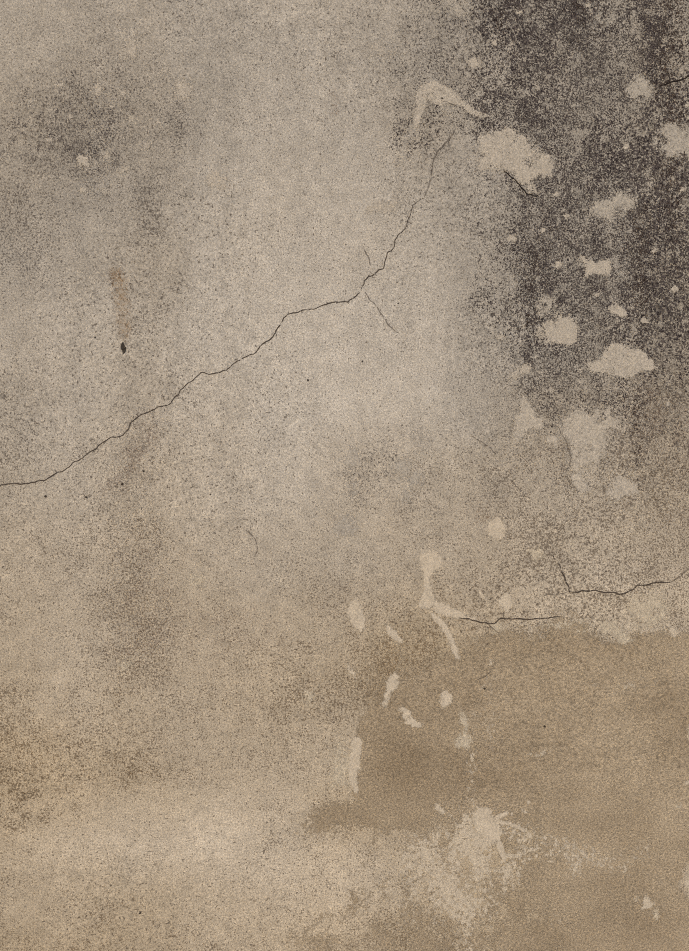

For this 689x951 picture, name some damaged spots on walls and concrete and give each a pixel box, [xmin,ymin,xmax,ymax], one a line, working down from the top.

crack [0,198,423,486]
water stain [389,0,689,481]
crack [460,616,560,624]
crack [553,555,669,595]
flaking render [286,588,689,951]